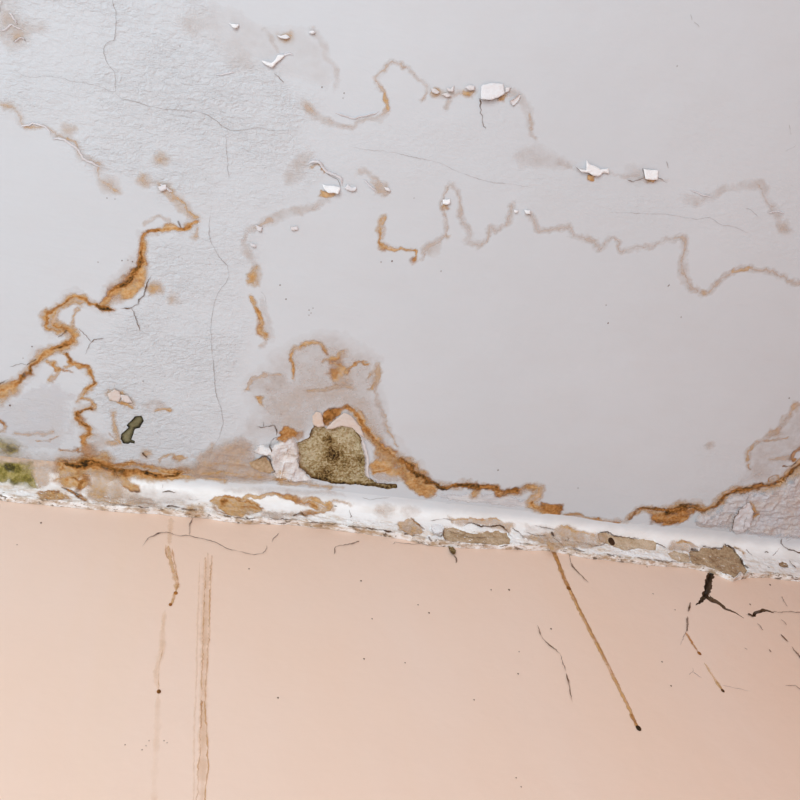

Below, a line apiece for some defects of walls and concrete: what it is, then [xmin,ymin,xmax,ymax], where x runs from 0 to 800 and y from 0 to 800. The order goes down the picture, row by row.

leakage [0,184,332,506]
spalling [107,390,144,444]
crack [144,490,450,555]
spalling [249,412,397,489]
leakage [277,340,607,552]
peeling [431,518,513,562]
leakage [613,447,800,526]
peeling [668,540,749,577]
corrosion [552,552,606,661]
crack [682,573,800,657]
crack [537,625,572,697]
corrosion [611,674,641,731]